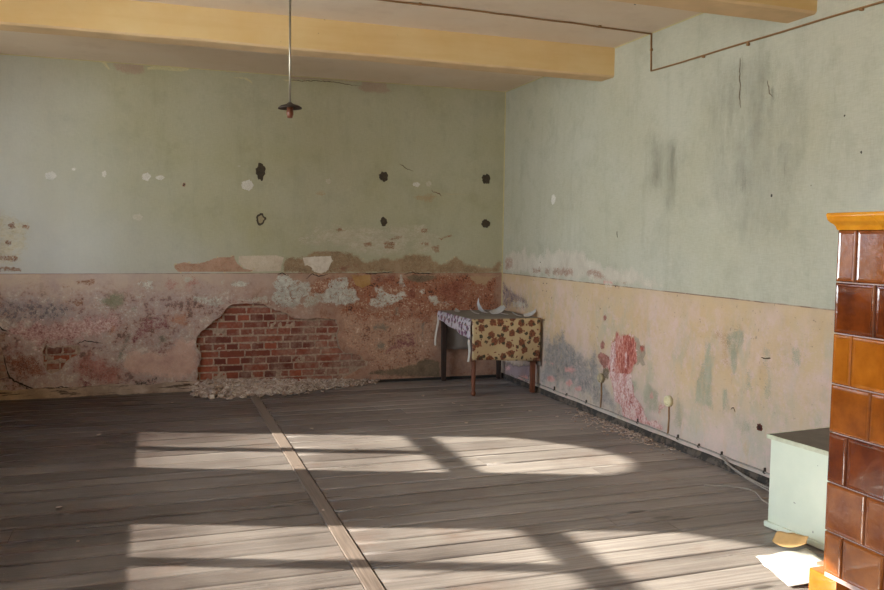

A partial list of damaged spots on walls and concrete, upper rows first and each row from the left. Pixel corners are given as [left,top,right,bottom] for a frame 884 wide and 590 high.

spalling [256,163,266,181]
peeling [165,249,502,294]
crack [4,357,33,389]
flaking render [42,345,81,374]
flaking render [196,303,368,382]
leakage [541,328,622,420]
peeling [598,331,665,431]